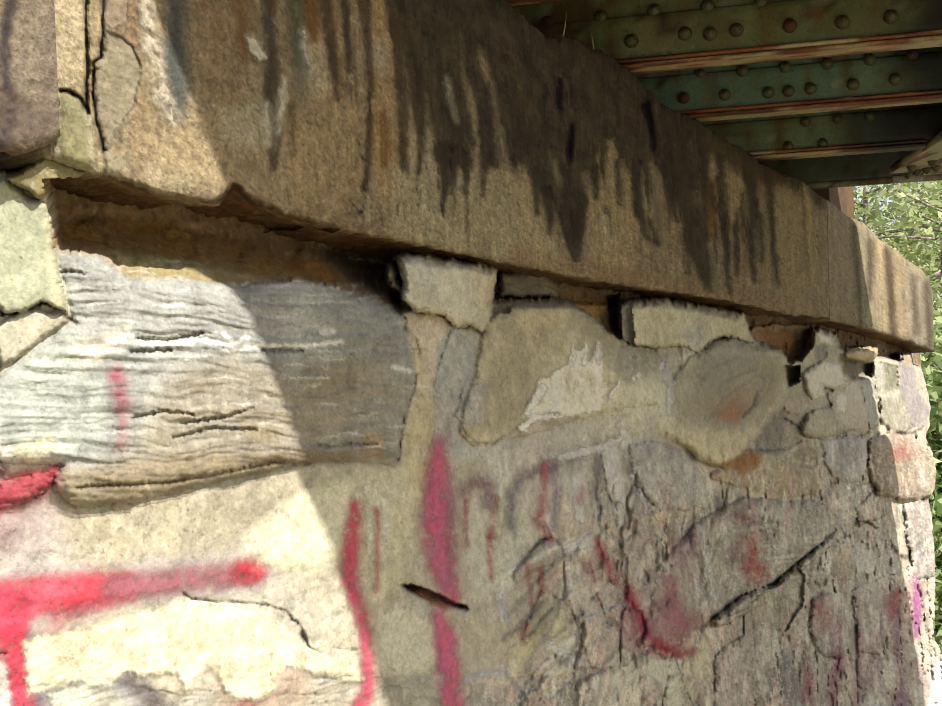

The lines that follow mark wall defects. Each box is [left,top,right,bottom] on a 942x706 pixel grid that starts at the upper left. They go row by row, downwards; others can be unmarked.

water stain [141,0,182,122]
water stain [246,0,294,167]
water stain [322,0,374,101]
water stain [363,113,374,191]
water stain [387,0,825,304]
peeling [518,343,620,432]